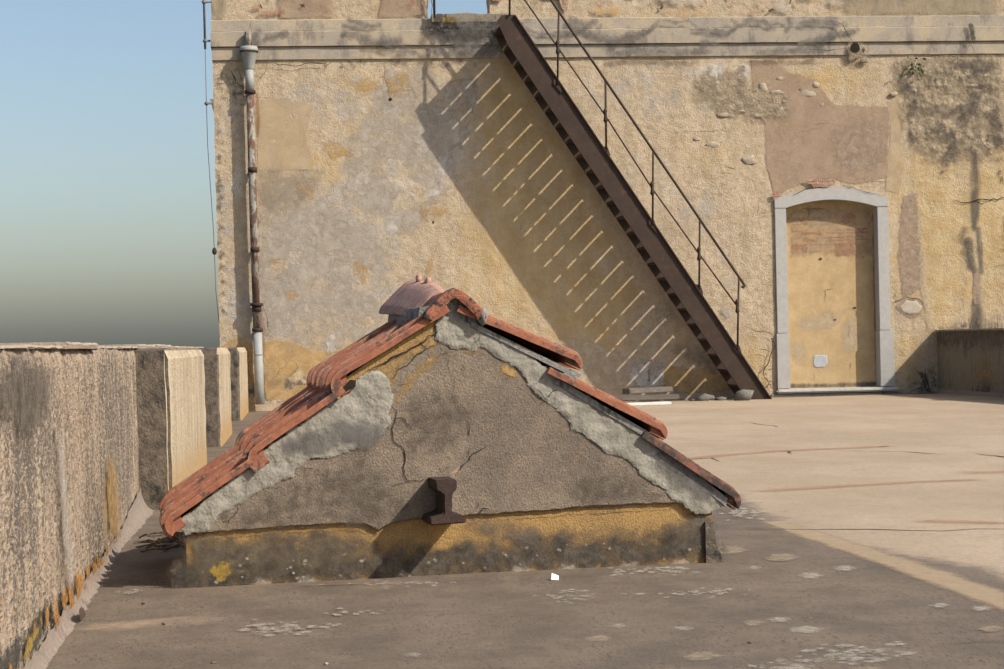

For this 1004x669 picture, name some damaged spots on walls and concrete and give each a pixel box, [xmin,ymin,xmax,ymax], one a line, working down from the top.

water stain [343,19,503,56]
water stain [521,17,859,56]
spalling [695,63,791,122]
water stain [899,57,1003,273]
crack [955,196,1004,204]
crack [357,330,488,487]
water stain [170,516,710,589]